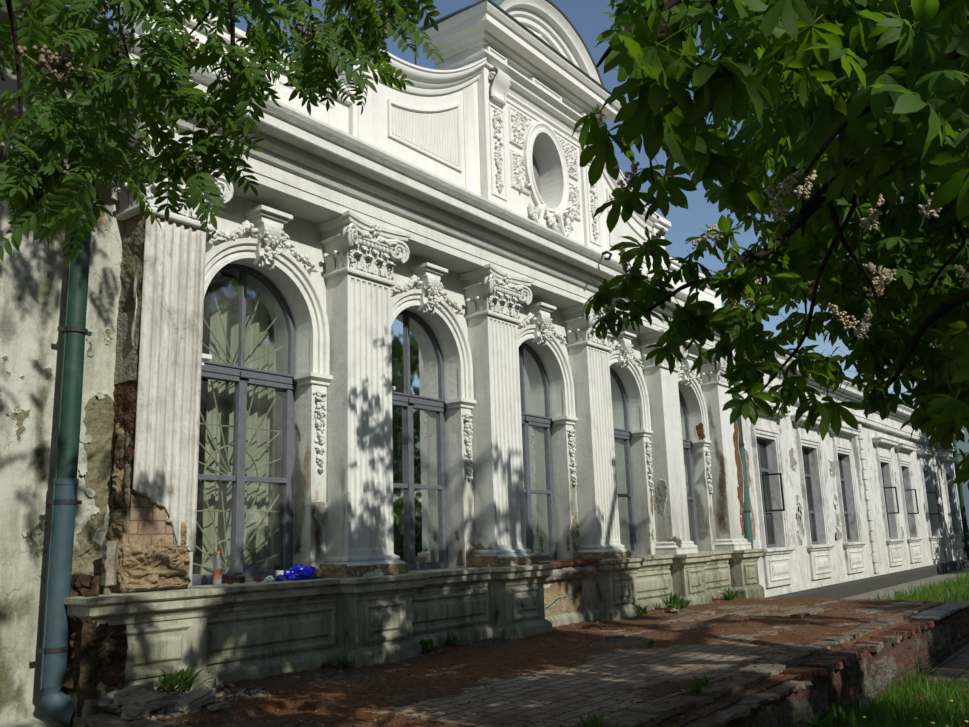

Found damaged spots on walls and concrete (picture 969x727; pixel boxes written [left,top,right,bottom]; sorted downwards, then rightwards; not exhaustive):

peeling [4,405,31,444]
peeling [22,518,50,556]
spalling [69,379,191,597]
peeling [646,468,668,543]
peeling [694,421,716,546]
flaking render [544,579,584,617]
spalling [63,614,128,717]